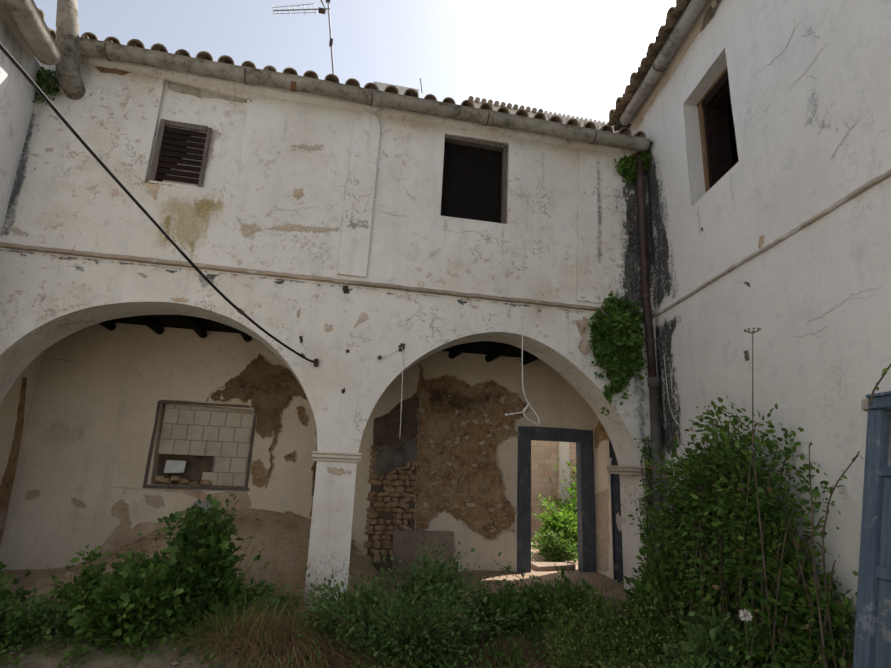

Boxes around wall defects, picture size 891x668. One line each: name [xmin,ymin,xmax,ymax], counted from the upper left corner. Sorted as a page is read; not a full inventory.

damp [3,114,35,236]
peeling [238,219,368,239]
damp [616,149,672,309]
spalling [92,499,186,560]
spalling [165,352,317,512]
spalling [363,363,529,573]
spalling [574,316,592,358]
damp [656,316,682,455]